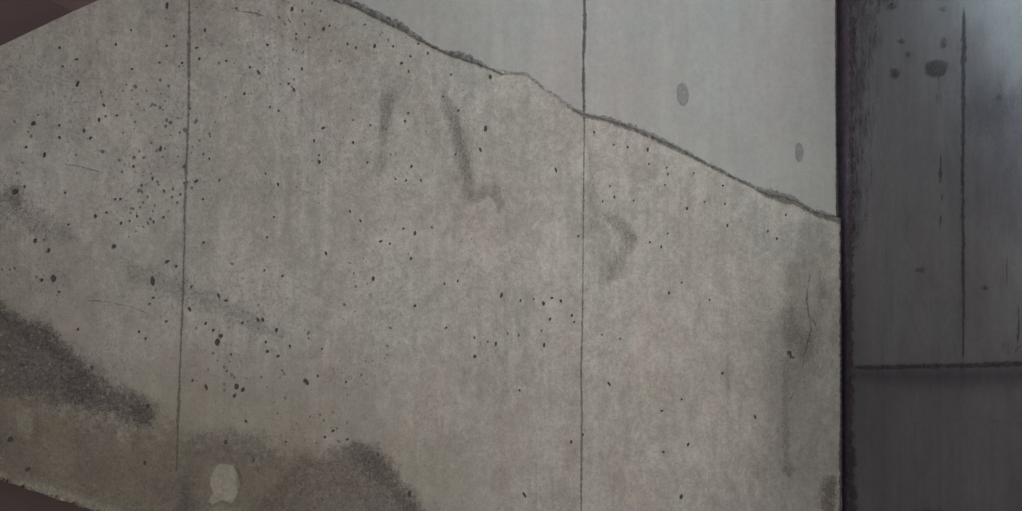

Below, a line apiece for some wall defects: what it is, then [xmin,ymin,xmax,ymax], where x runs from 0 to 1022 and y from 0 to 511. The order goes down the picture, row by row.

damp [0,301,152,423]